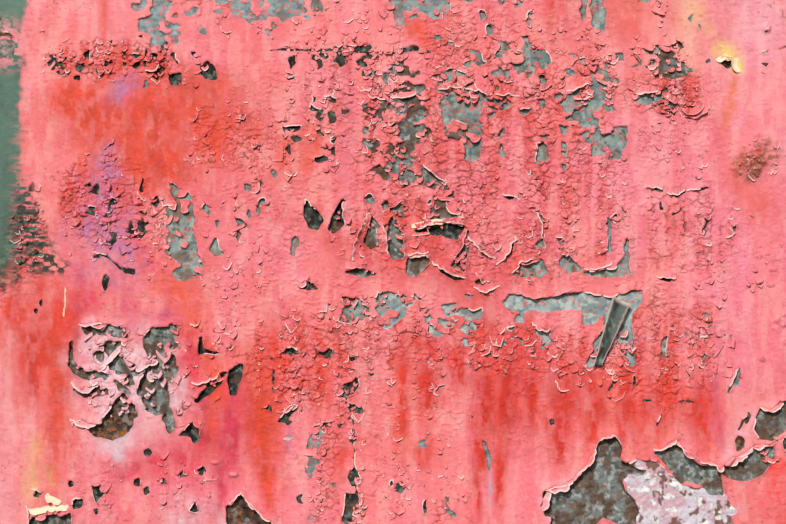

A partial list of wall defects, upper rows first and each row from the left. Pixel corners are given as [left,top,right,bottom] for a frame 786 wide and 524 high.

peeling [41,0,217,89]
corrosion [381,136,459,189]
corrosion [21,0,366,524]
peeling [68,315,243,443]
peeling [251,286,643,524]
corrosion [313,219,730,524]
peeling [23,479,123,524]
peeling [134,478,150,495]
peeling [144,447,219,516]
peeling [226,489,277,524]